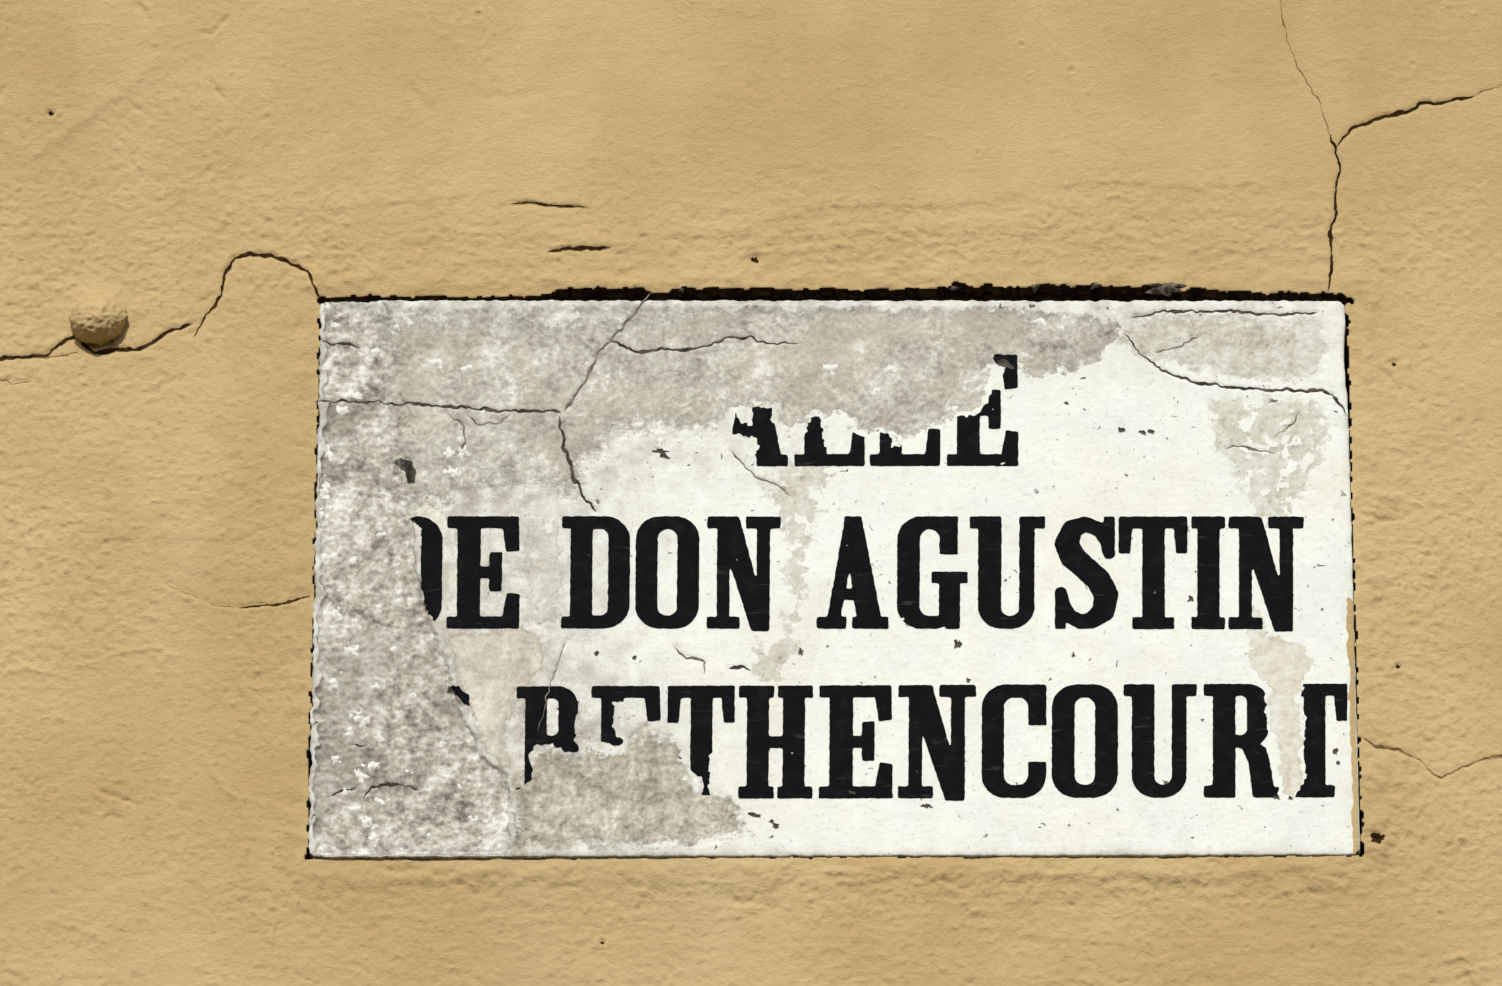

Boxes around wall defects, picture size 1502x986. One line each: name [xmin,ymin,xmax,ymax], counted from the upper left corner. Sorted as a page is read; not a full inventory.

crack [1131,0,1501,353]
crack [0,251,322,384]
crack [325,340,361,348]
peeling [312,301,1332,855]
crack [1364,738,1502,778]